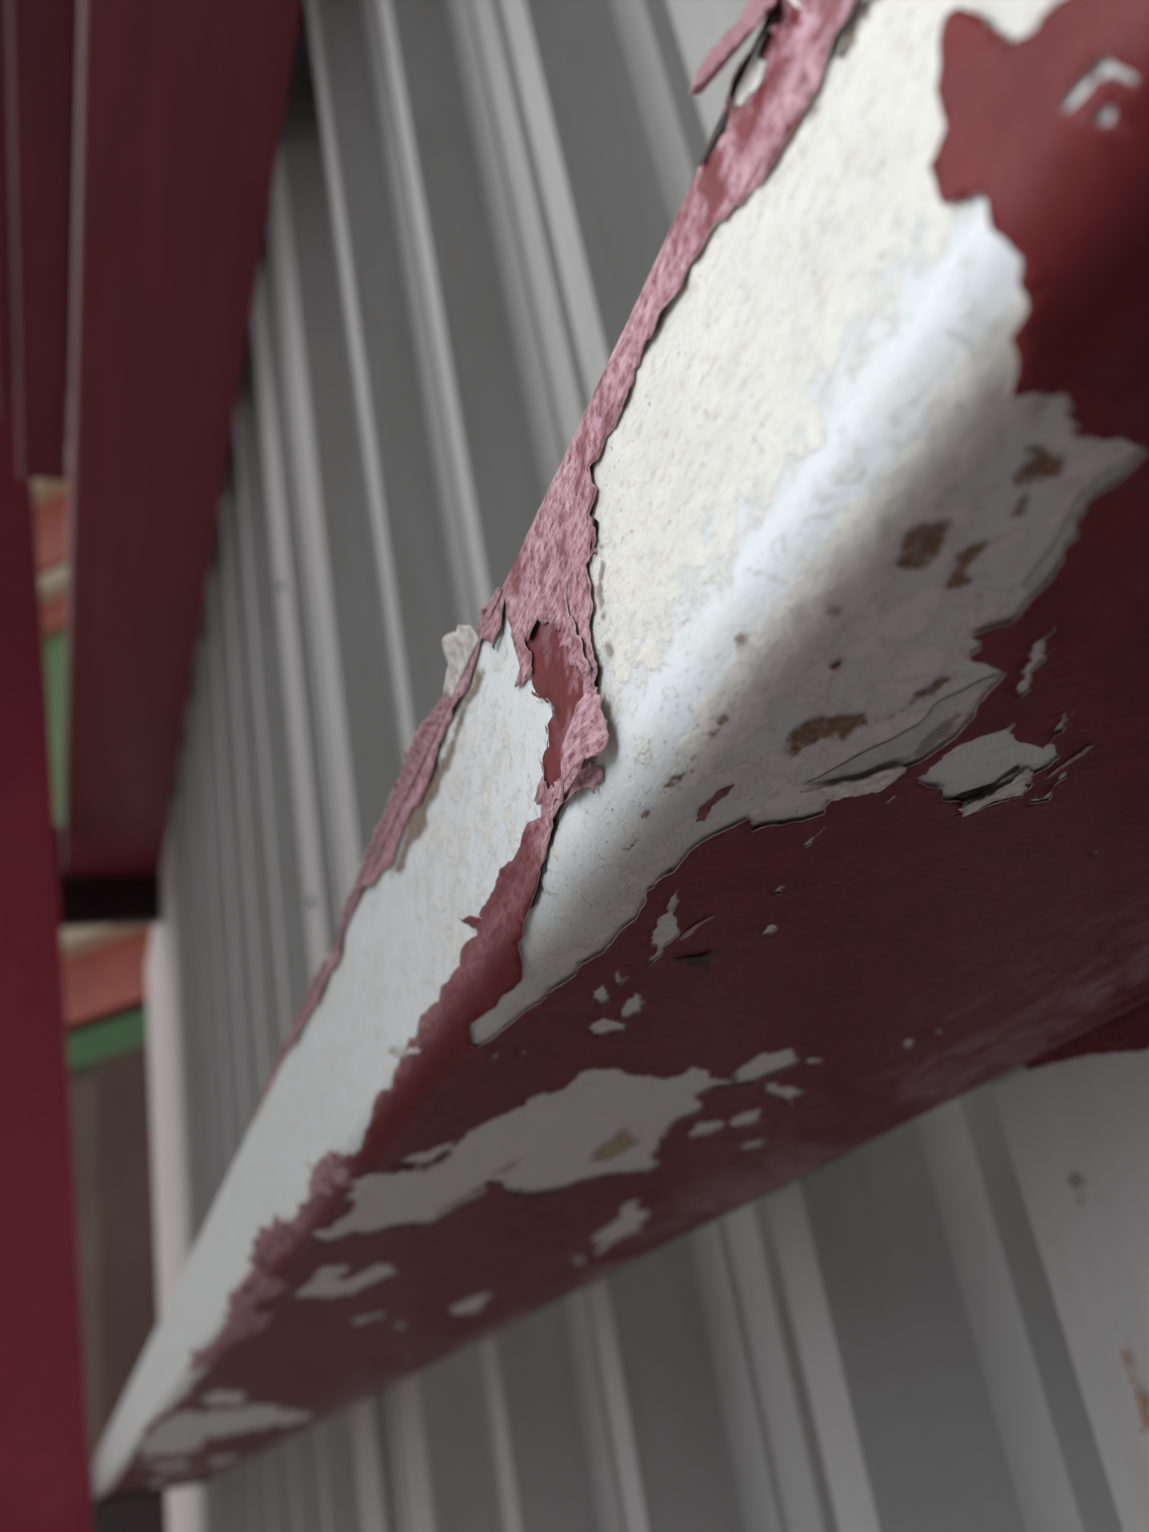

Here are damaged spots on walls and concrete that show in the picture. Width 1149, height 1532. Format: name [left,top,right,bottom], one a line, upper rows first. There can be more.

peeling [470,0,1148,1048]
rust [895,523,989,590]
rust [1012,447,1064,517]
rust [784,676,971,761]
peeling [91,613,804,1502]